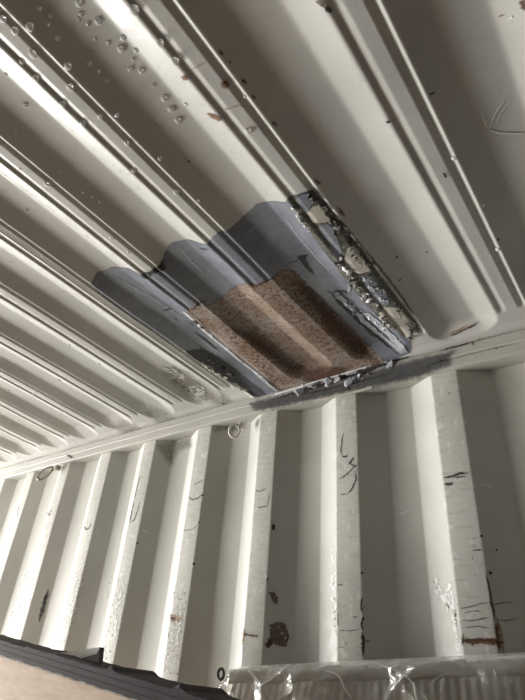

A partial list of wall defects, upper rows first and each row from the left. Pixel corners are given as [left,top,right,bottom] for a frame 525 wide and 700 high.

peeling [288,191,419,342]
rust [188,269,385,391]
peeling [186,348,265,399]
peeling [433,574,461,653]
rust [461,573,504,652]